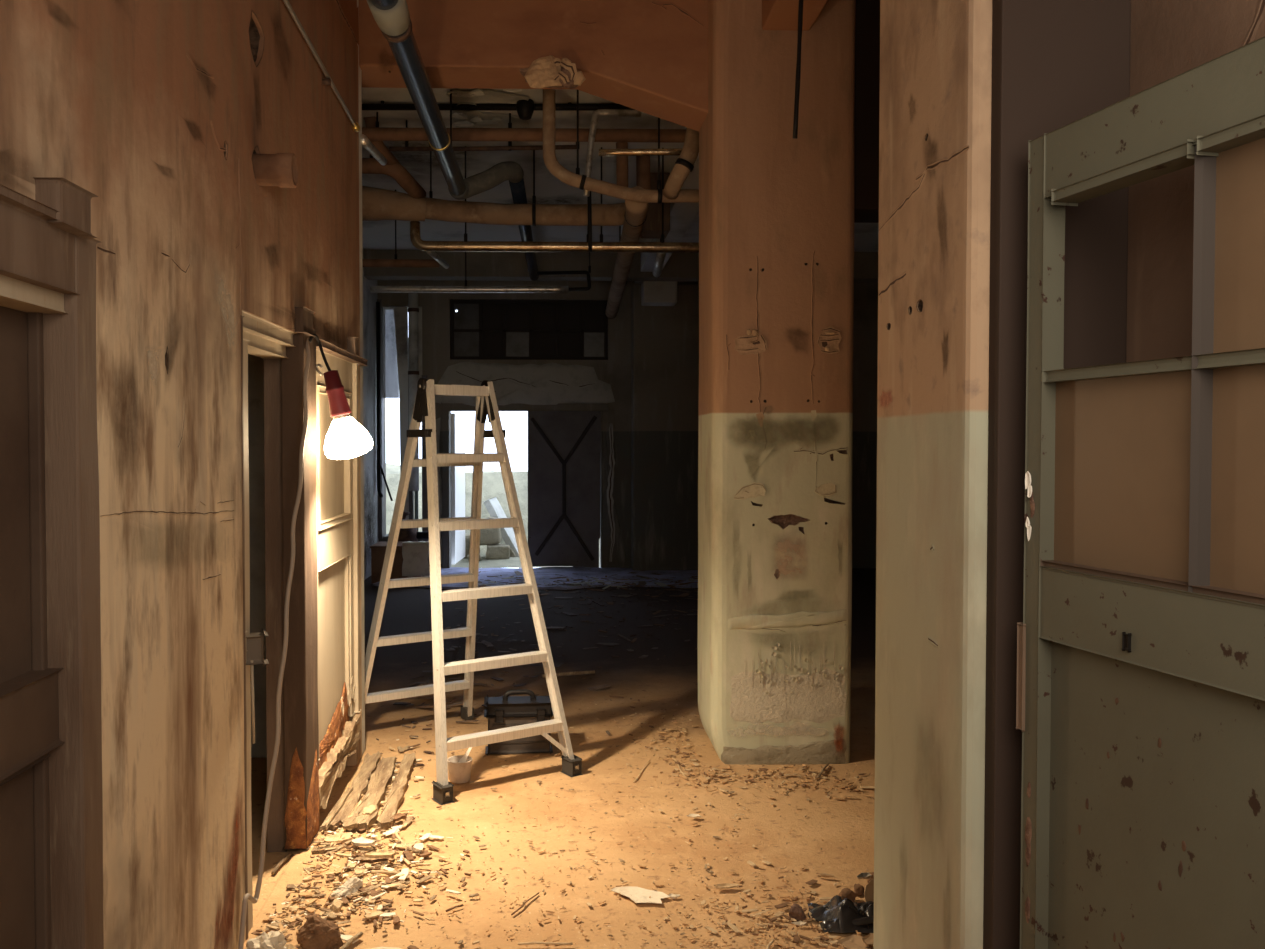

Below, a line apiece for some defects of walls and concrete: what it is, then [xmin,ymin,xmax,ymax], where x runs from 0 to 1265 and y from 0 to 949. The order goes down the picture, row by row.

crack [879,145,969,232]
spalling [751,501,810,535]
rust [284,681,349,849]